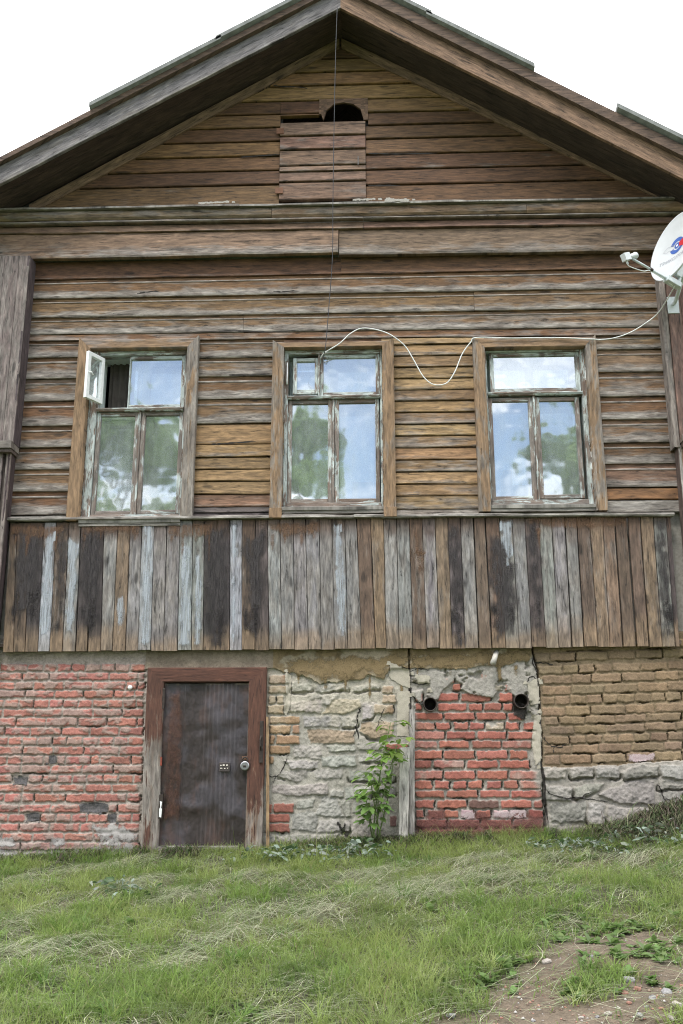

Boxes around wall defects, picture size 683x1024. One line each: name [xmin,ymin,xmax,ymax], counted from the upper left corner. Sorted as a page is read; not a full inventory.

crack [353,708,385,738]
flaking render [523,678,543,769]